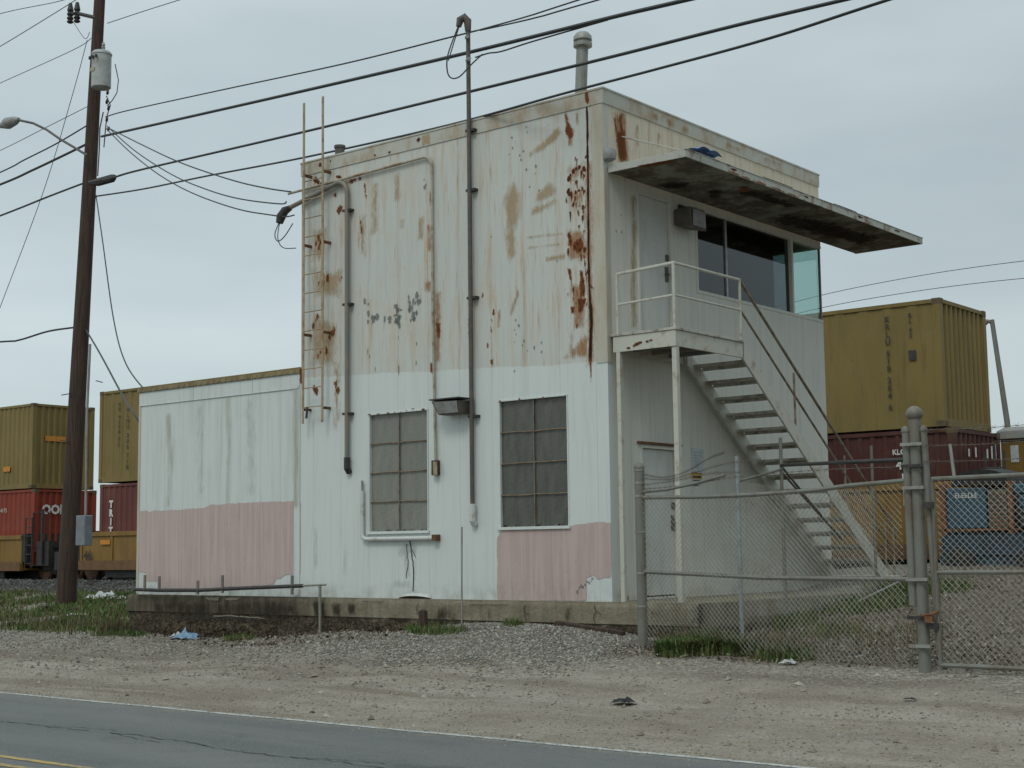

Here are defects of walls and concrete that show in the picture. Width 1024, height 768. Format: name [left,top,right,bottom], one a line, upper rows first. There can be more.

rust [536,114,577,151]
rust [614,113,674,168]
rust [566,165,586,210]
rust [506,189,517,256]
rust [317,274,342,293]
rust [546,232,586,326]
rust [312,313,335,360]
peeling [363,291,421,338]